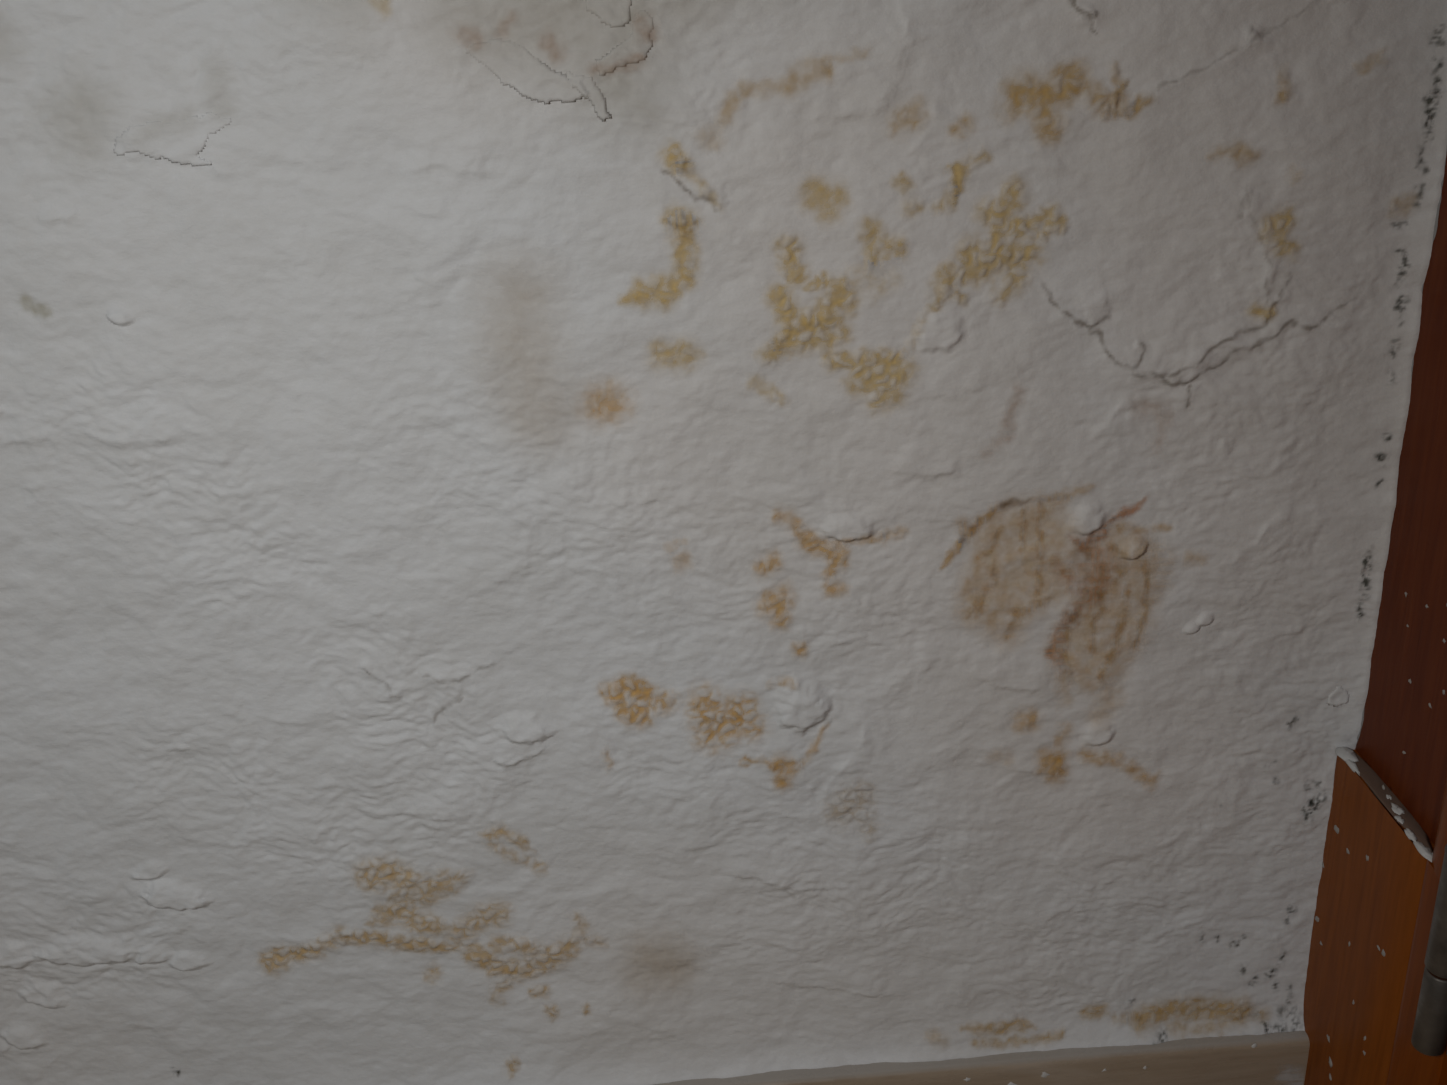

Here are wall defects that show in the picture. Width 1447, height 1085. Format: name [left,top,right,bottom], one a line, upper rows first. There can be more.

water stain [622,210,697,304]
water stain [943,187,1065,298]
water stain [768,242,906,407]
peeling [1336,747,1360,776]
peeling [1386,794,1433,862]
water stain [262,864,574,976]